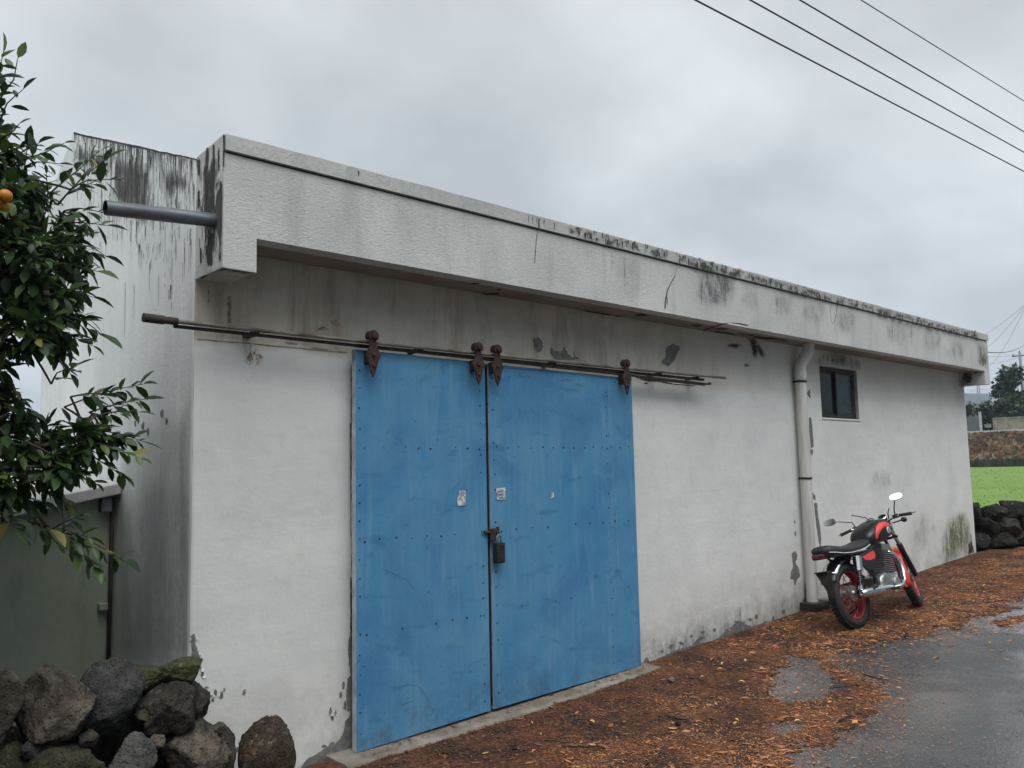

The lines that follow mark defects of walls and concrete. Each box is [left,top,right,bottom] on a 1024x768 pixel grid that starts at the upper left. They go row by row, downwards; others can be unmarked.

damp [73,132,241,305]
damp [571,228,985,382]
peeling [533,337,579,360]
spalling [662,344,680,367]
peeling [791,551,800,586]
peeling [190,634,225,702]
peeling [301,632,352,768]